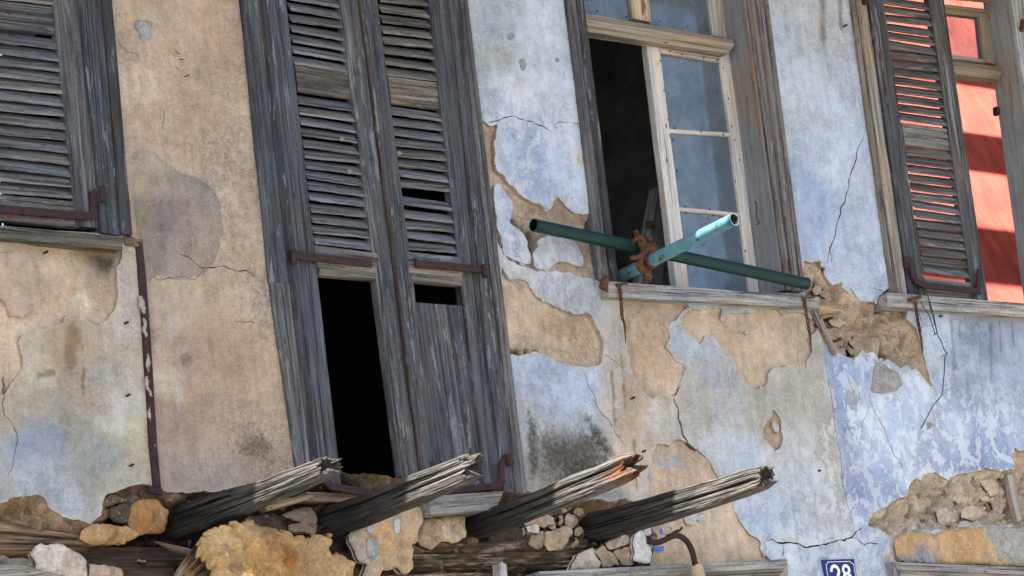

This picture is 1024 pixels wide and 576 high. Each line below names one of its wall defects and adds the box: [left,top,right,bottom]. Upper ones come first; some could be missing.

flaking render [483,124,595,279]
flaking render [0,242,120,396]
flaking render [502,275,600,367]
flaking render [623,263,931,399]
water stain [529,419,609,477]
flaking render [517,500,767,568]
flaking render [648,440,717,497]
flaking render [763,412,780,453]
crack [767,528,877,556]
flaking render [868,450,1024,537]